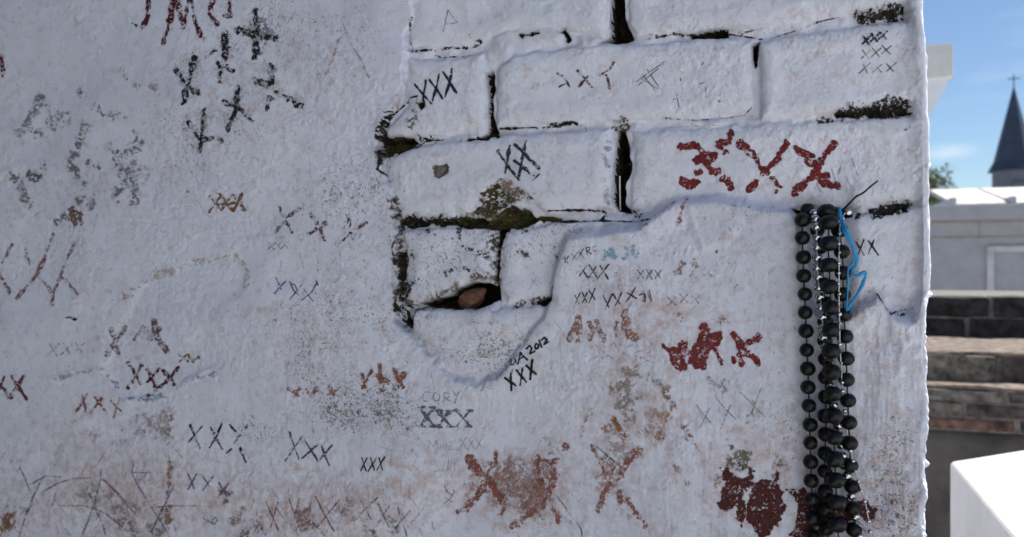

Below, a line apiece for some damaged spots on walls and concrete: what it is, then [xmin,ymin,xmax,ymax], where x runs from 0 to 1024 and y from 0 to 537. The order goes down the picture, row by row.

mould [853,2,904,25]
mould [816,95,912,131]
spalling [380,0,922,384]
leakage [852,200,912,220]
leakage [396,179,535,326]
leakage [512,286,553,309]